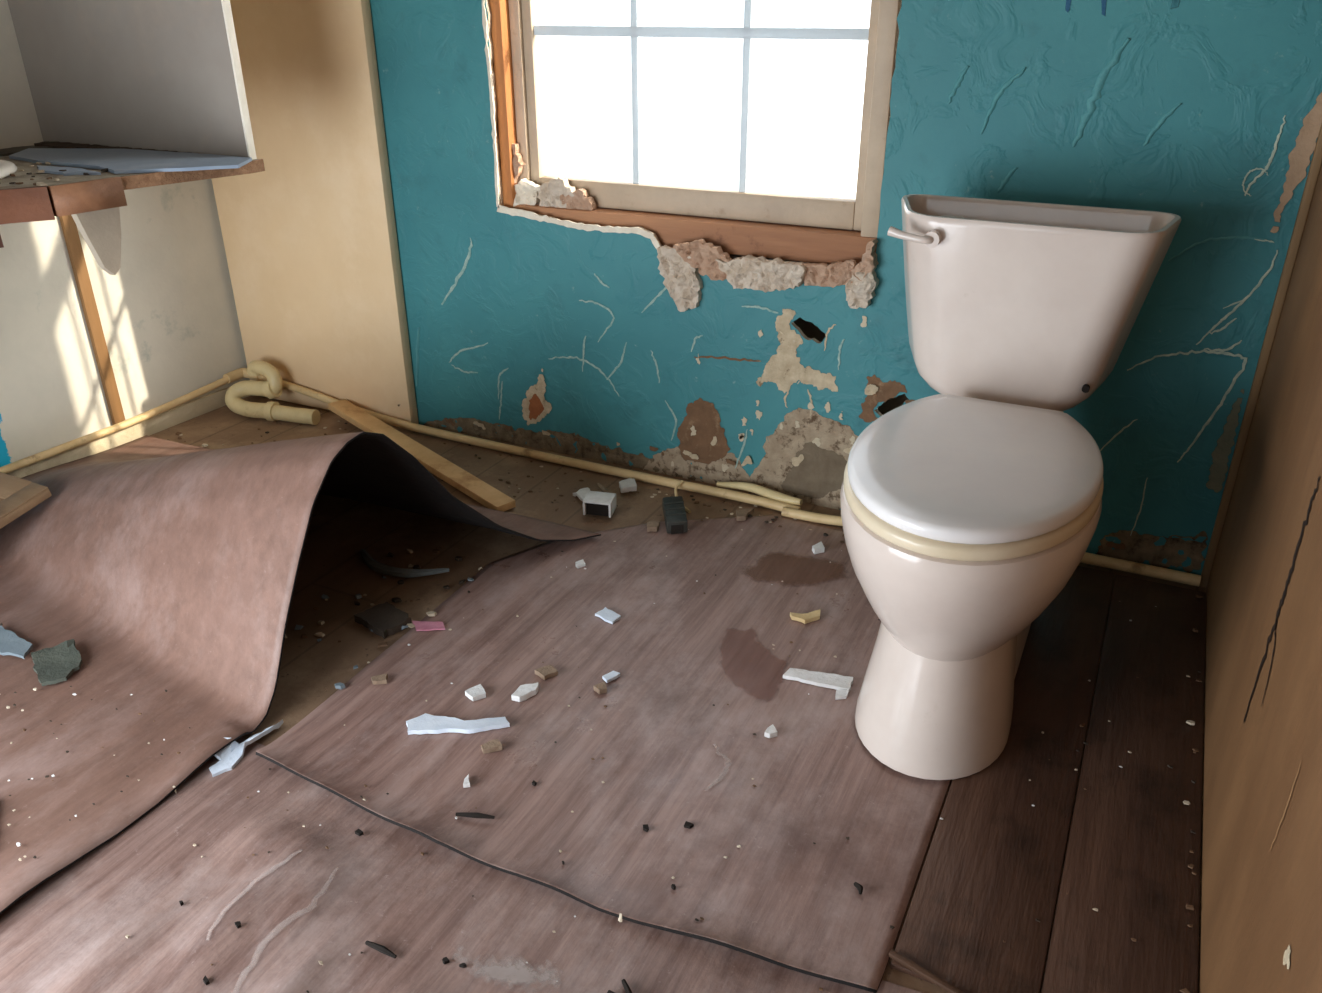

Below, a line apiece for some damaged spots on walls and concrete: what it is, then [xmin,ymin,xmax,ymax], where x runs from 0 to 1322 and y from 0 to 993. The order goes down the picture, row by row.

spalling [482,0,879,312]
peeling [1270,92,1322,233]
peeling [505,369,552,436]
flaking render [643,374,915,510]